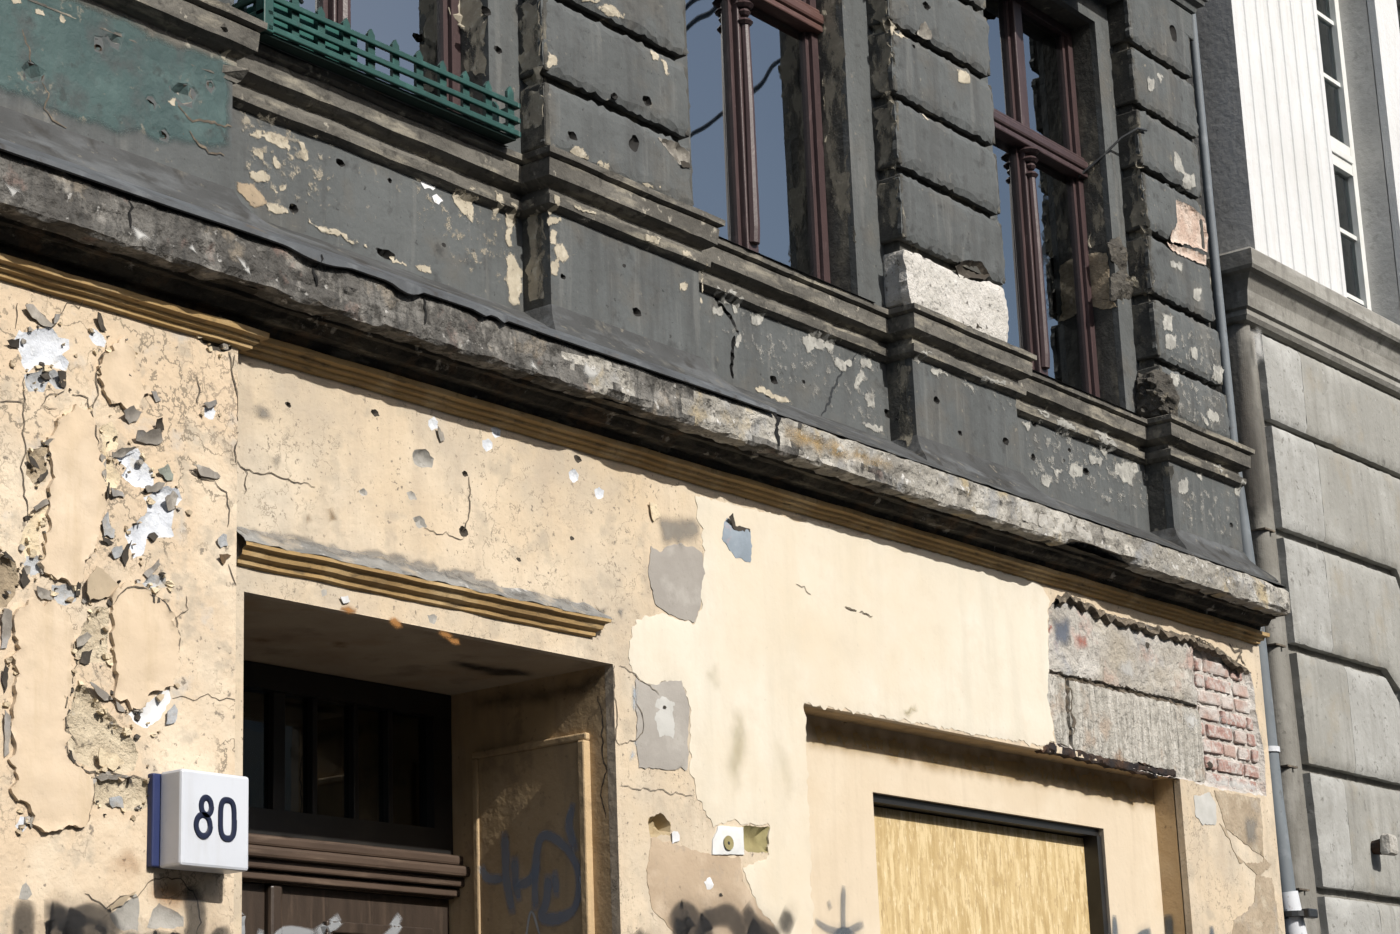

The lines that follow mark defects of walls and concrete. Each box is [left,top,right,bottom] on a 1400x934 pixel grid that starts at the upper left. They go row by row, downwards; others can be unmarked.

peeling [473,191,597,305]
crack [714,297,739,379]
peeling [680,264,883,433]
spalling [896,251,1009,342]
spalling [1167,151,1208,271]
crack [190,346,313,525]
spalling [0,391,182,693]
crack [426,482,471,540]
spalling [648,502,705,623]
spalling [65,682,178,811]
spalling [1047,591,1279,934]
spalling [646,813,779,934]